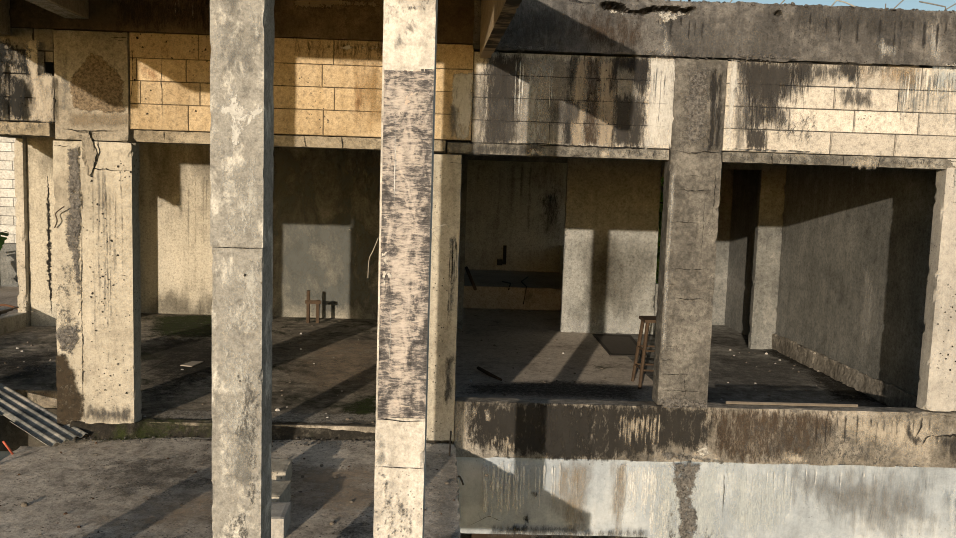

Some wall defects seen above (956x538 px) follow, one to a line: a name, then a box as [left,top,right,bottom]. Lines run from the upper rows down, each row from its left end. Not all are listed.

spalling [655,0,726,22]
spalling [752,0,956,13]
leakage [882,10,956,53]
spalling [70,53,125,113]
leakage [478,10,675,159]
leakage [707,60,955,165]
leakage [851,156,941,170]
leakage [444,358,454,401]
leakage [726,349,875,402]
leakage [433,380,956,538]
leakage [291,443,412,538]
spalling [661,446,724,538]